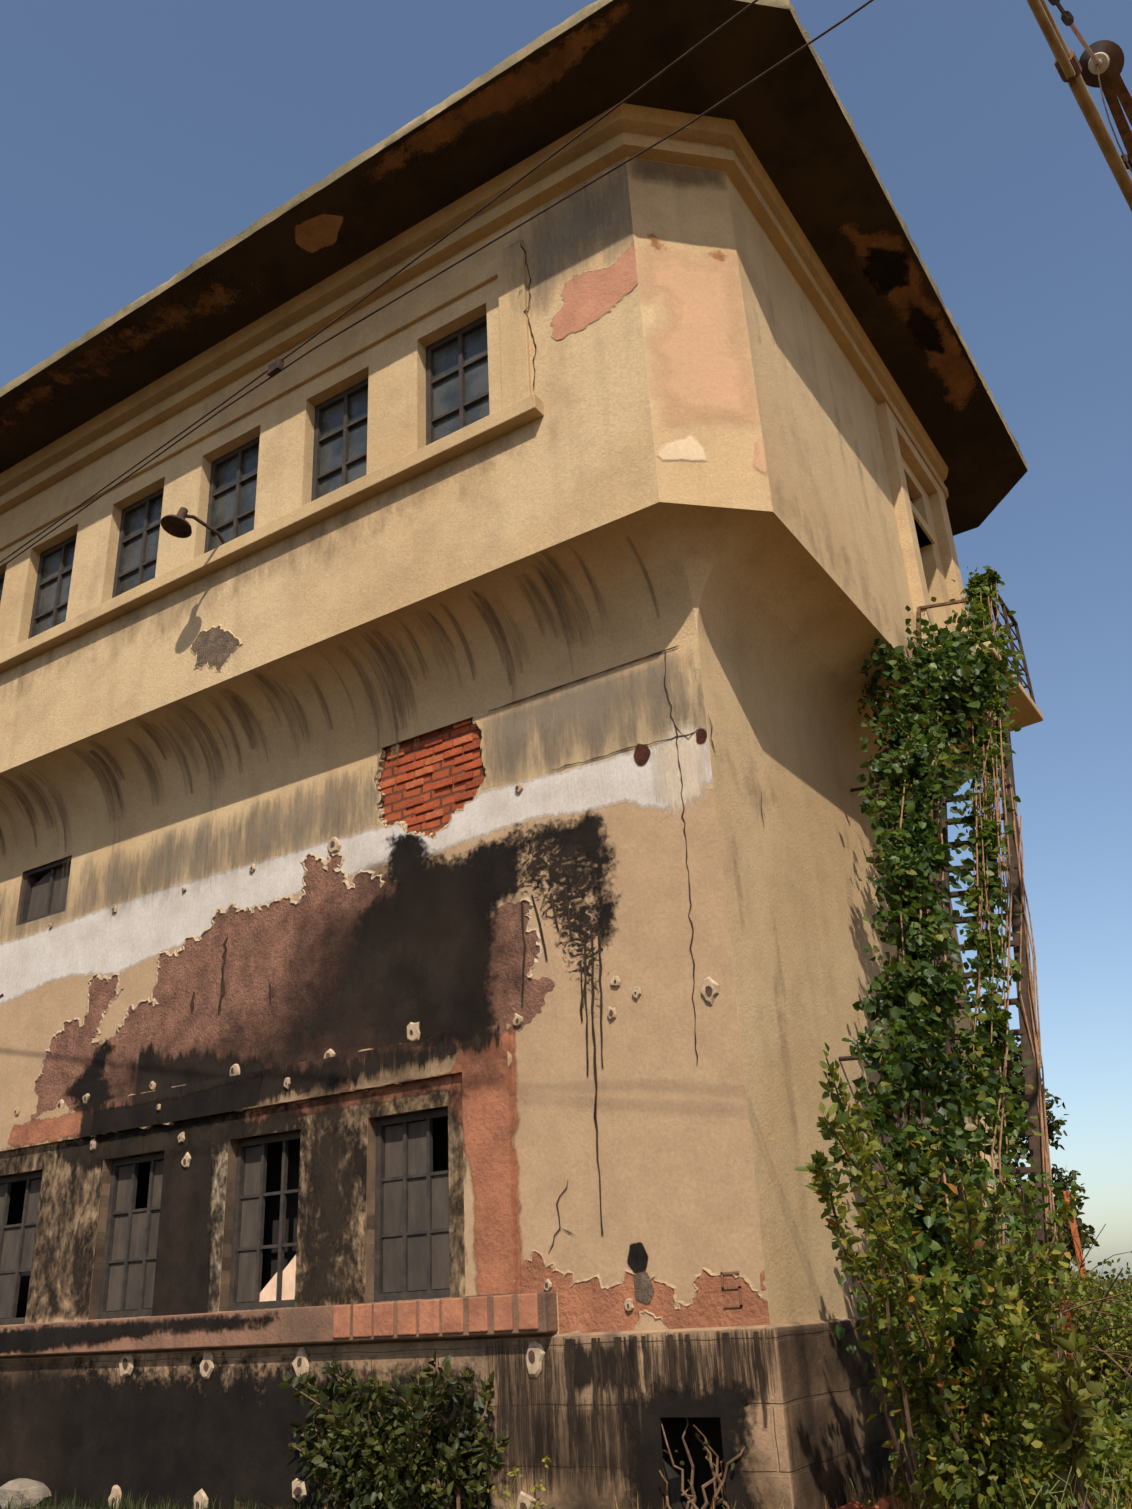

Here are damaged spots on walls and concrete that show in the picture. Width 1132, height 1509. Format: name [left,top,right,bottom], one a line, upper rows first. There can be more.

peeling [295,214,344,253]
crack [518,244,537,389]
peeling [550,242,638,341]
spalling [190,624,243,673]
flaking render [373,717,486,836]
flaking render [8,851,770,1333]
damp [521,888,604,1235]
damp [486,1329,780,1509]